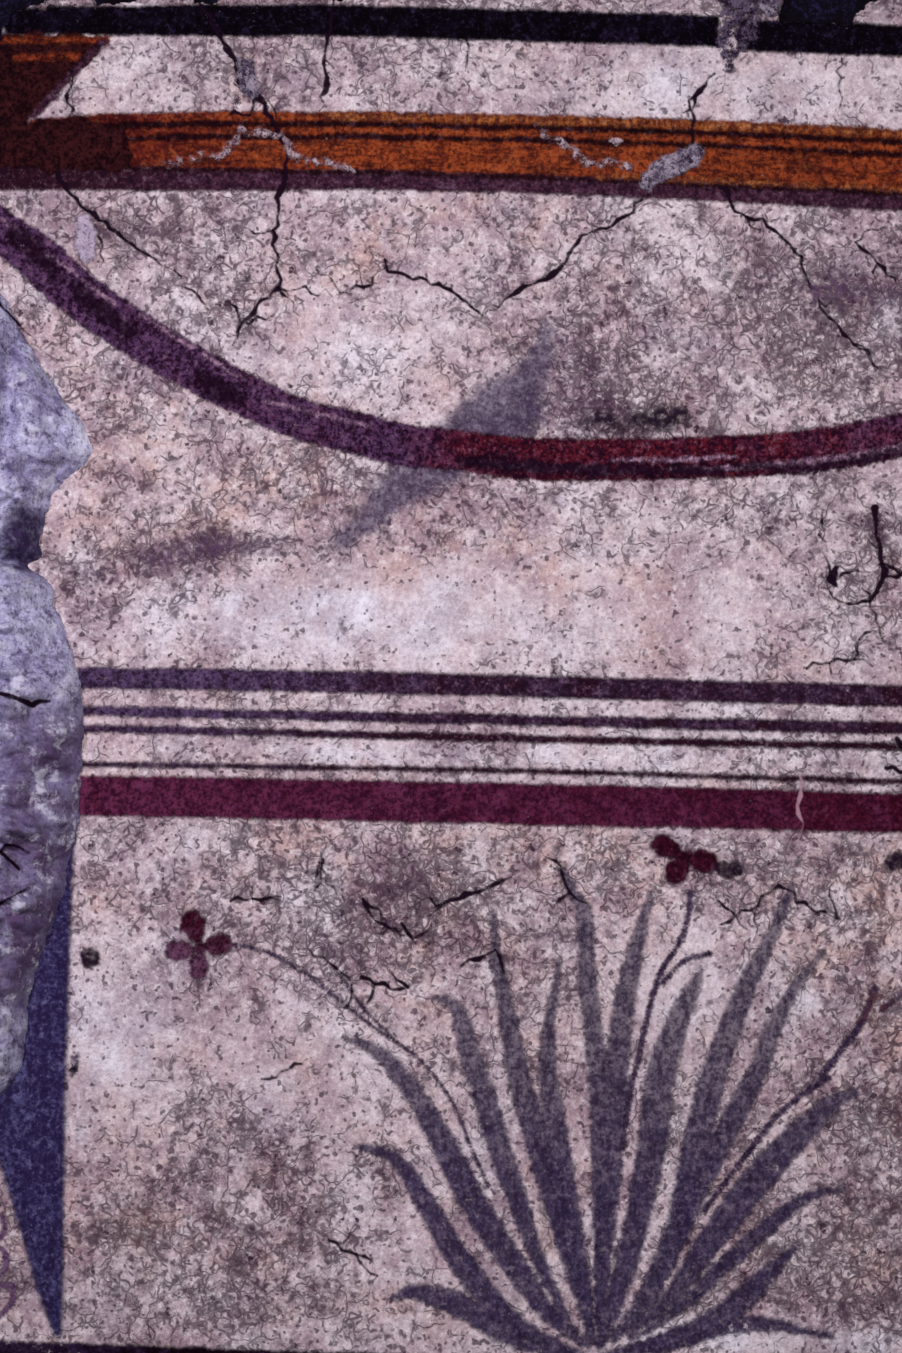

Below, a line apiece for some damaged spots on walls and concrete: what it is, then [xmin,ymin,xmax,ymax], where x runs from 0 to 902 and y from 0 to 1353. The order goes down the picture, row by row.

flaking render [715,0,877,73]
crack [683,72,716,145]
crack [57,0,644,346]
spalling [541,131,704,192]
crack [718,185,878,368]
crack [855,228,896,283]
crack [805,504,902,674]
crack [885,736,902,774]
crack [546,856,586,904]
crack [718,883,839,940]